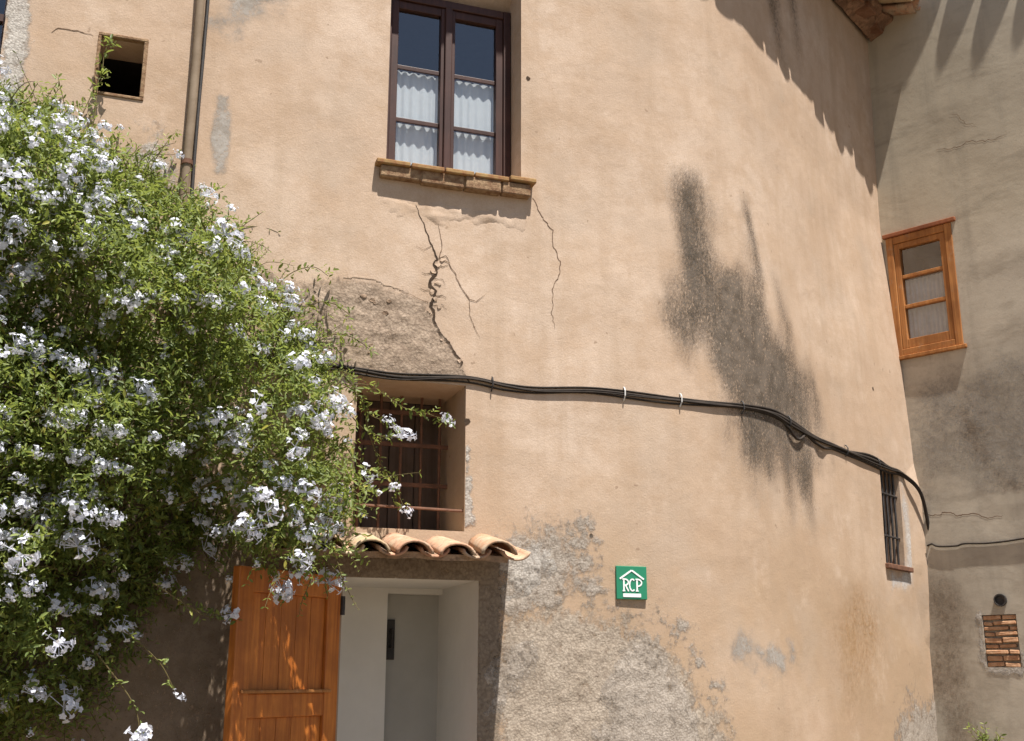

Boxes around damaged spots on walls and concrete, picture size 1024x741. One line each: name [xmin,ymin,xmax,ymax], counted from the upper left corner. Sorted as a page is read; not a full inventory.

water stain [211,95,231,172]
spalling [257,273,465,376]
crack [407,206,485,382]
crack [533,199,561,326]
water stain [666,180,820,497]
peeling [484,515,735,741]